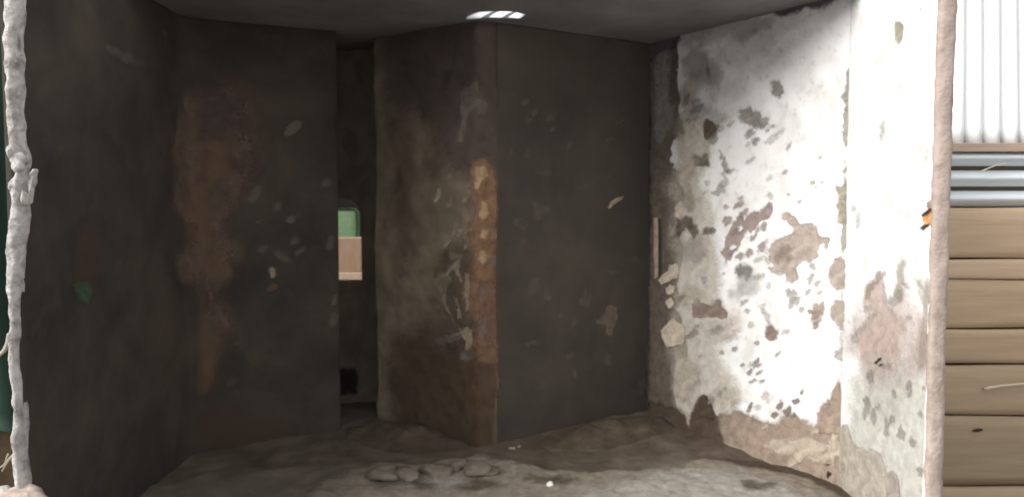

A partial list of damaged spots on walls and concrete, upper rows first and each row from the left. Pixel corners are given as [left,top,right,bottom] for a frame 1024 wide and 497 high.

spalling [434,158,498,446]
peeling [646,45,830,415]
water stain [647,75,900,497]